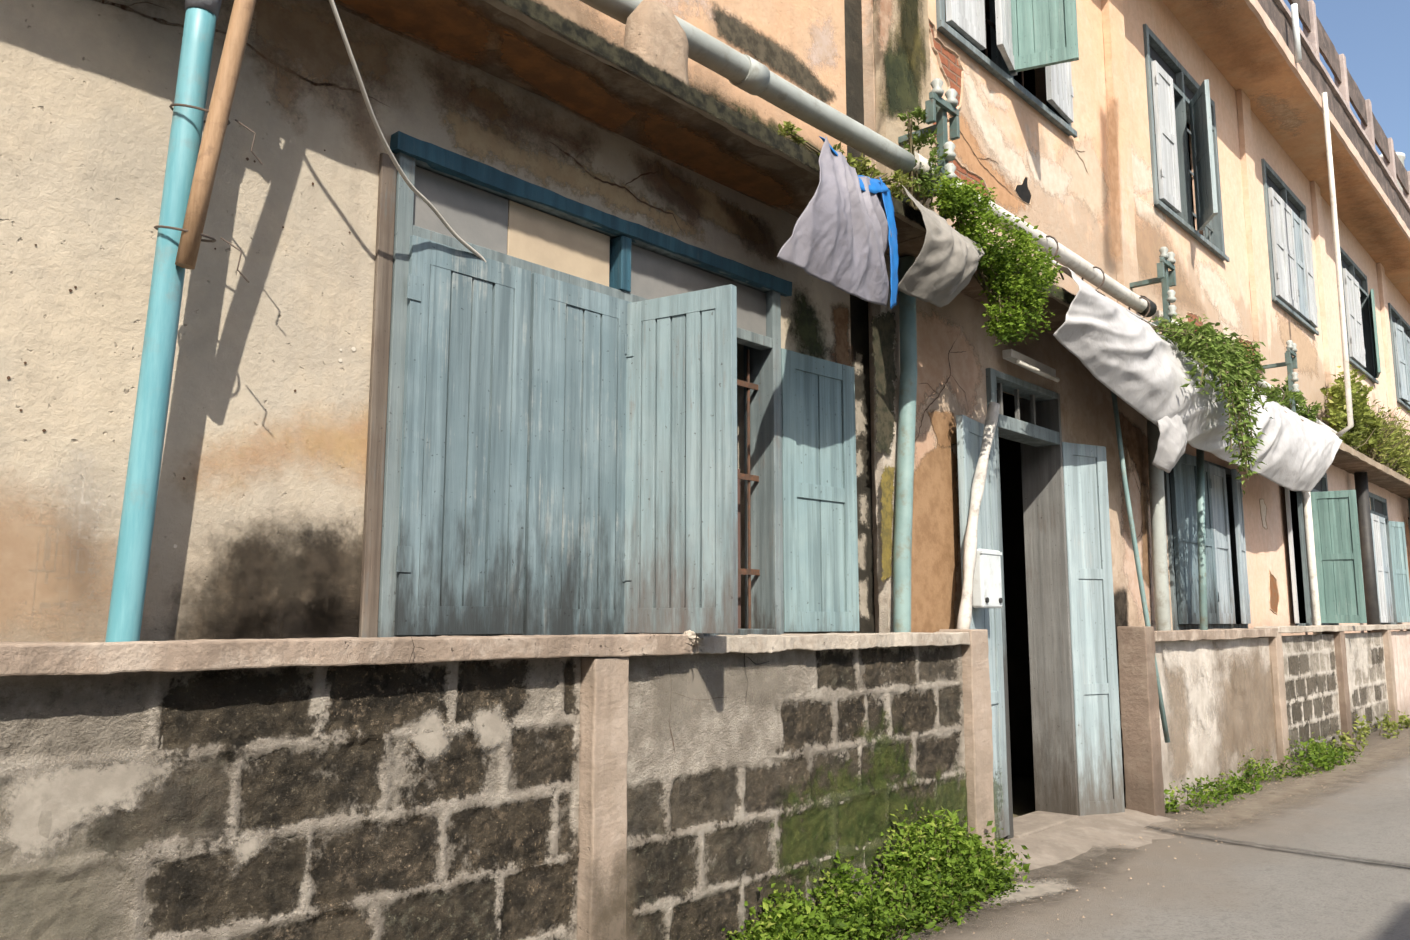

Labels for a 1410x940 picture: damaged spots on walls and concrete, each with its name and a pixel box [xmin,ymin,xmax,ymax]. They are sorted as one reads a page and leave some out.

crack [93,0,391,108]
damp [503,0,836,171]
damp [880,0,927,116]
peeling [928,18,1109,223]
damp [881,192,926,228]
damp [172,523,363,640]
damp [88,647,963,940]